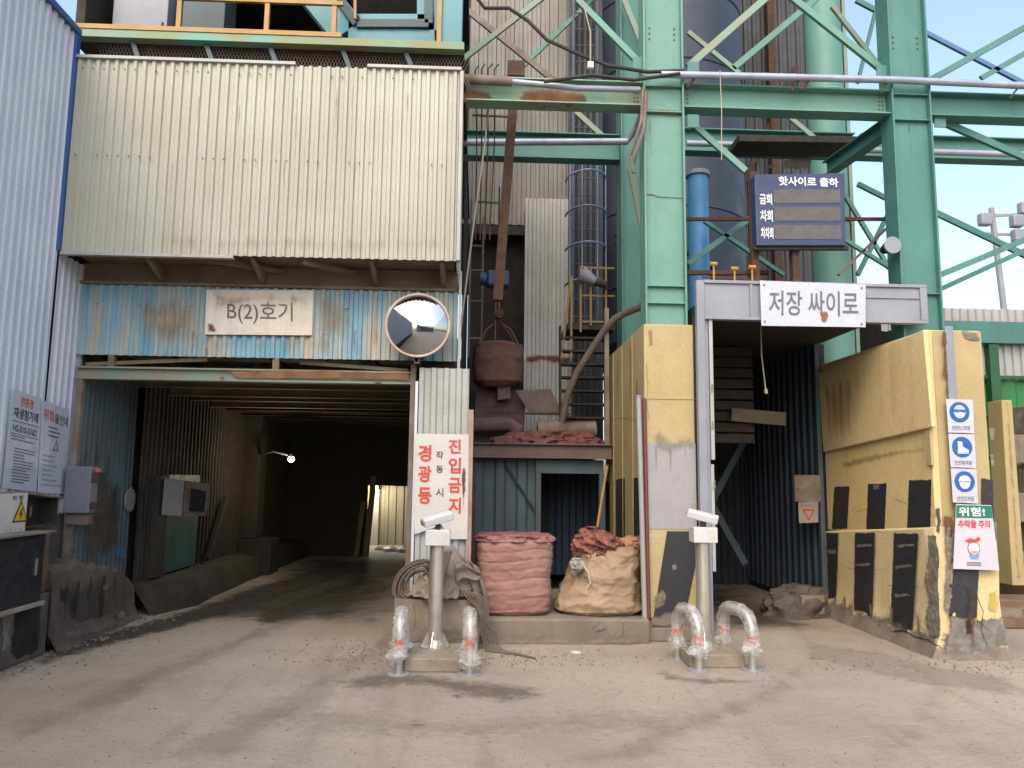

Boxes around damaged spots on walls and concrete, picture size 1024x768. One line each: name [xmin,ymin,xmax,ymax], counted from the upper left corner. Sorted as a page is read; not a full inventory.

corrosion [521,90,586,102]
spalling [924,508,1008,654]